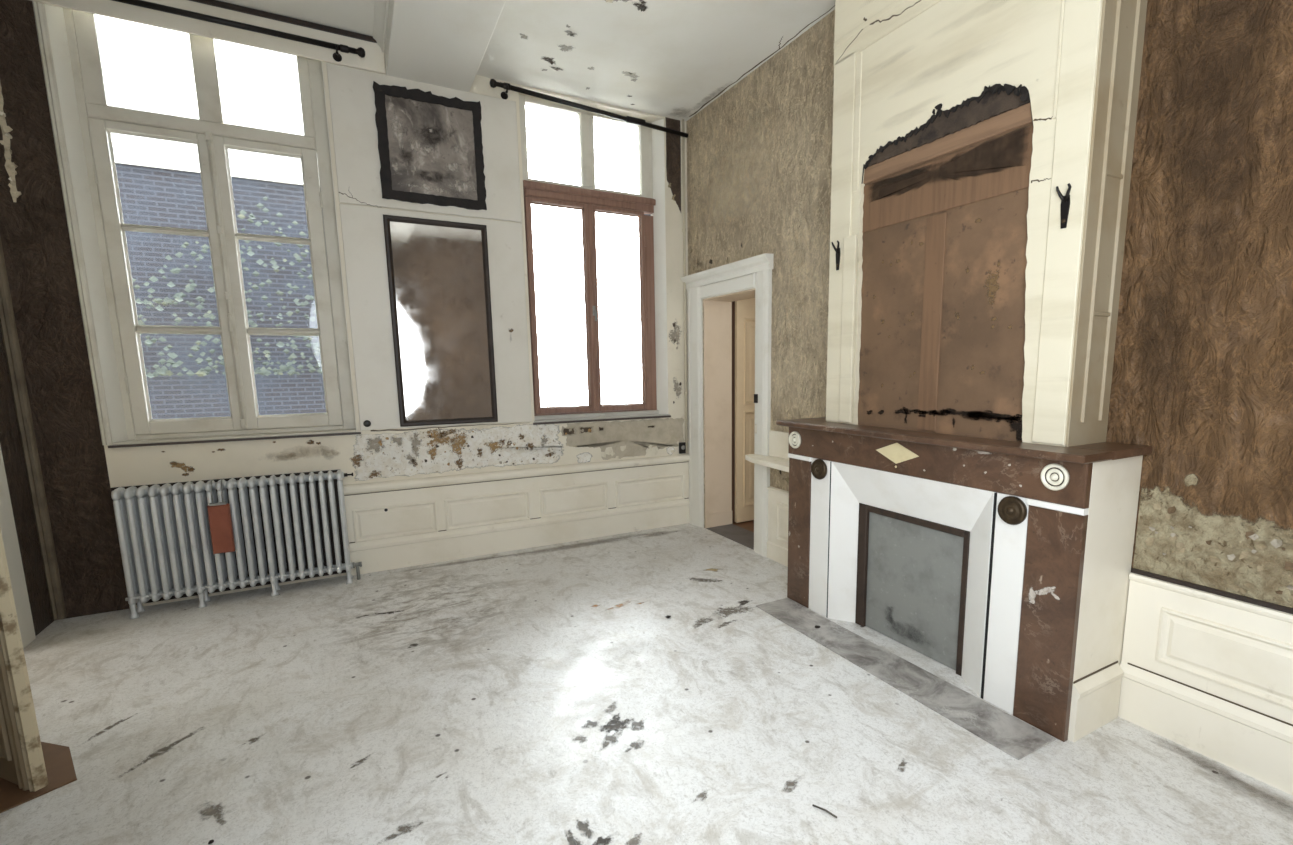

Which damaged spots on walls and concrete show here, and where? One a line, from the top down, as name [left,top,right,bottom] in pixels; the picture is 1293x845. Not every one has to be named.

peeling [542,25,576,71]
crack [836,0,921,63]
peeling [0,111,21,198]
peeling [669,322,680,349]
peeling [351,380,684,481]
peeling [1227,531,1293,572]